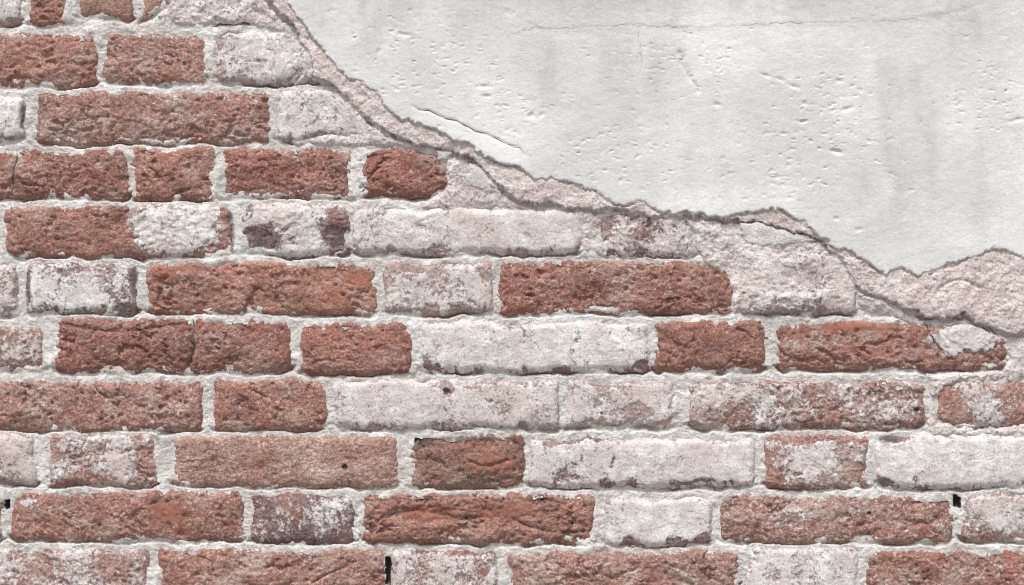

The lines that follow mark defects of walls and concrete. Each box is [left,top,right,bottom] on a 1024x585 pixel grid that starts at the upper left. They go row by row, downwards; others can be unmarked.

crack [417,108,522,150]
spalling [269,0,1024,334]
peeling [241,202,349,259]
peeling [951,381,1022,427]
peeling [5,497,39,510]